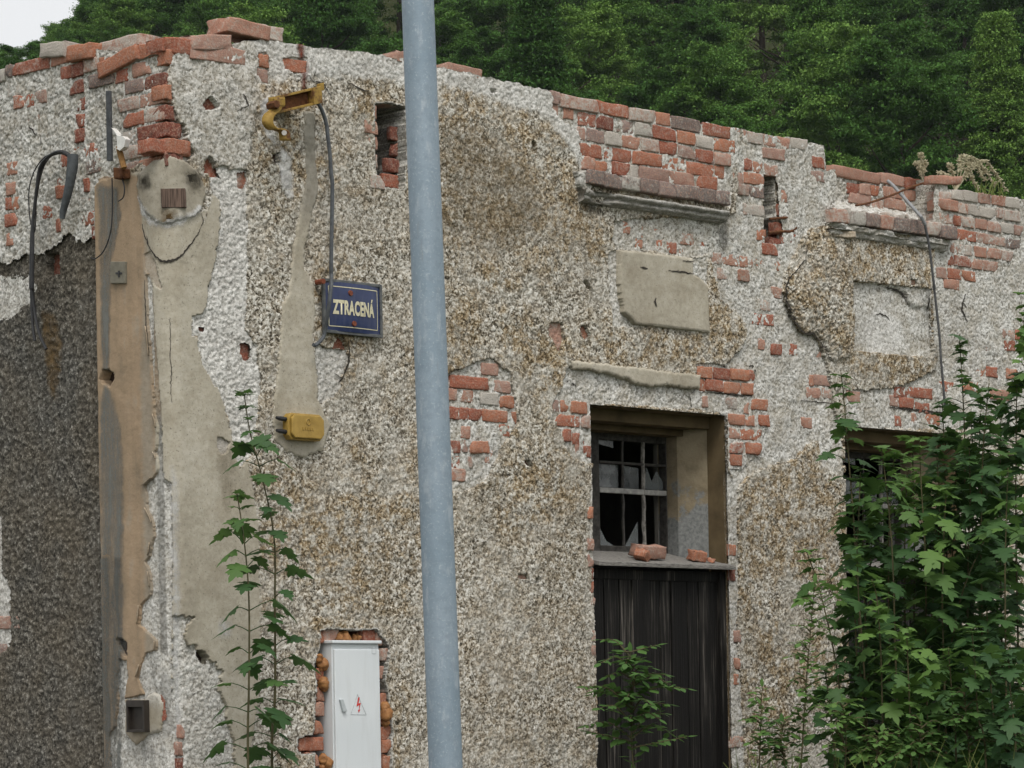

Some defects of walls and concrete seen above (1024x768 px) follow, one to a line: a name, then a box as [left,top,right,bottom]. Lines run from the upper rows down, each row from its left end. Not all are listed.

spalling [256,52,269,85]
spalling [283,57,307,74]
spalling [0,37,188,320]
spalling [448,358,517,492]
spalling [549,90,1024,768]
spalling [0,516,20,654]
spalling [110,276,235,768]